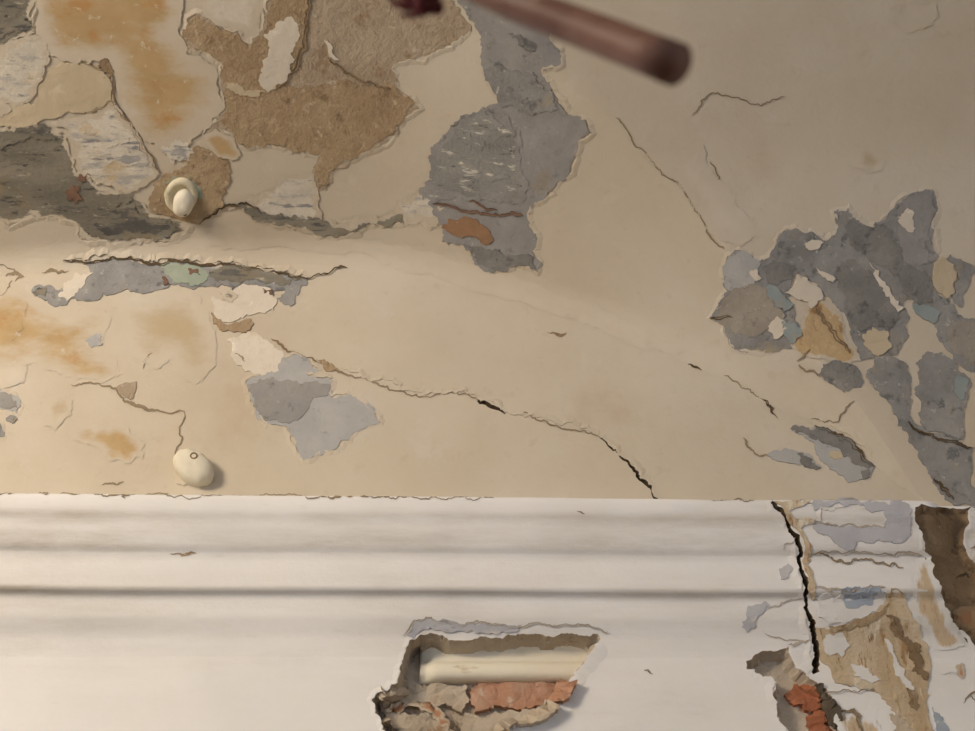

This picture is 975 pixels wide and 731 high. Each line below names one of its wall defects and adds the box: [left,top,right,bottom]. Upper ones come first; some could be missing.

damp [35,0,241,162]
flaking render [0,0,597,307]
damp [0,286,218,389]
crack [39,481,211,499]
crack [72,353,185,454]
peeling [241,339,385,464]
crack [260,493,493,501]
crack [318,359,661,499]
peeling [706,186,975,651]
crack [715,498,820,674]
flaking render [366,617,608,731]
flaking render [742,585,935,731]